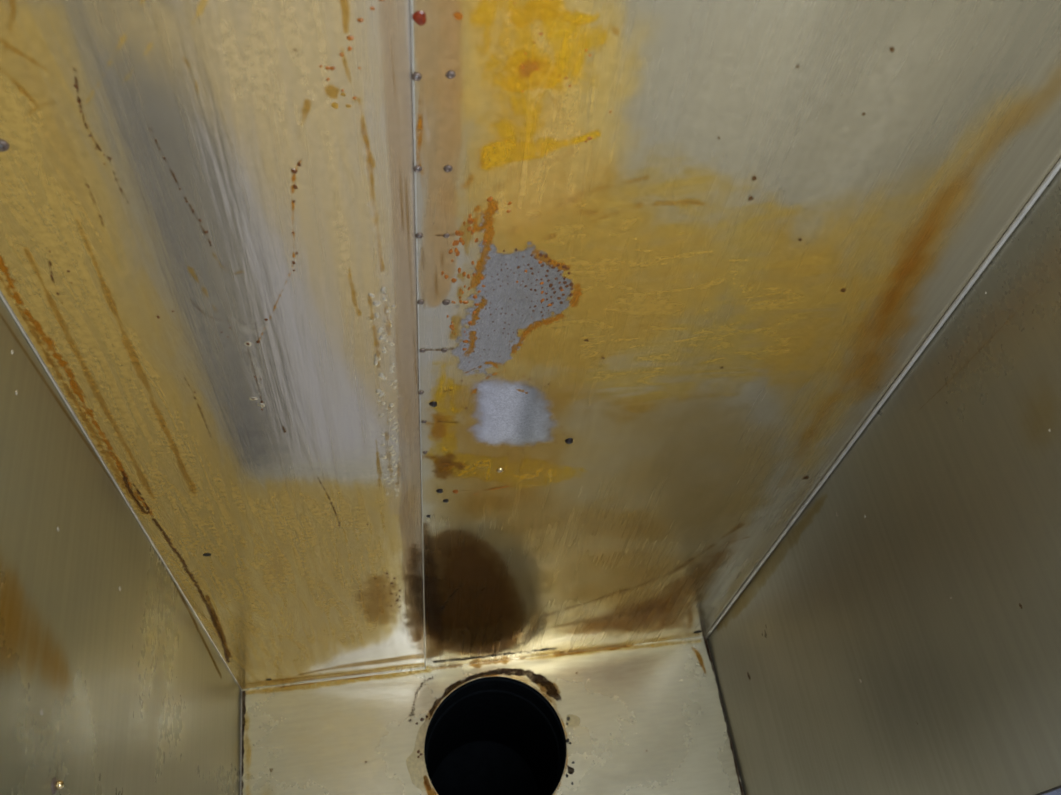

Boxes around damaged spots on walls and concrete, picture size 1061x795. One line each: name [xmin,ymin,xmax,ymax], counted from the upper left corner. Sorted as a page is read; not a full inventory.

peeling [452,196,581,455]